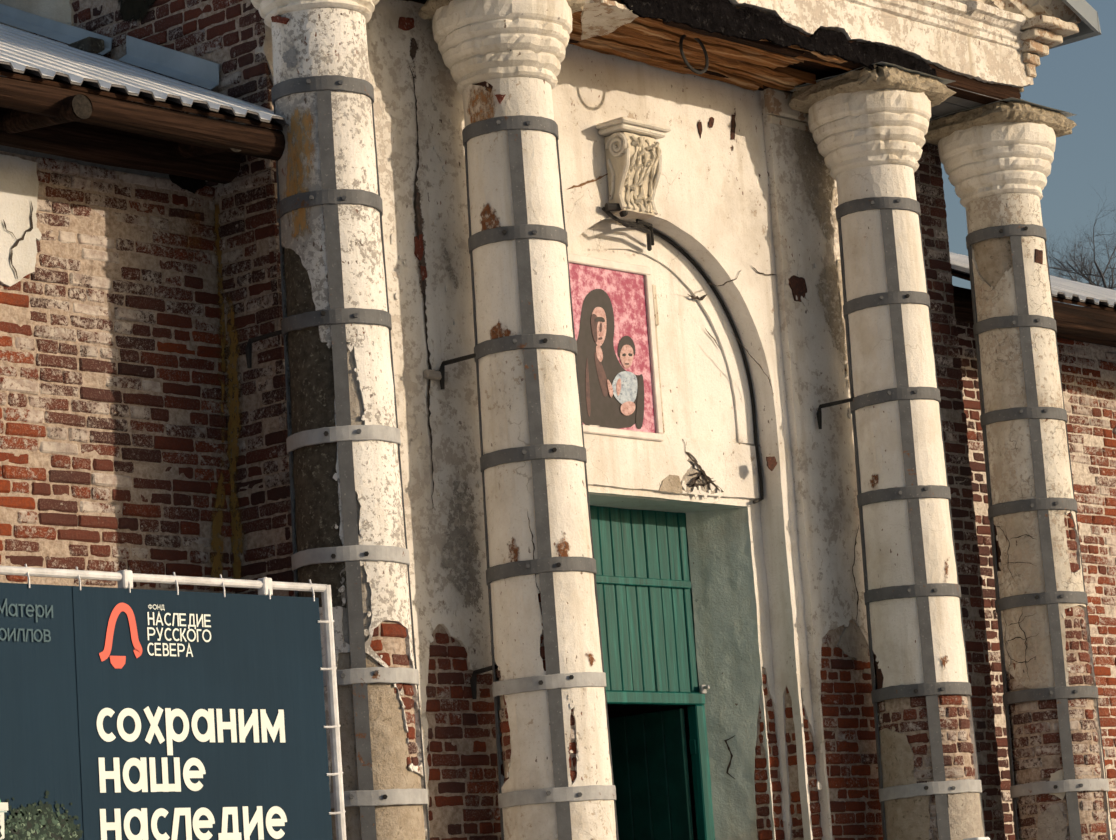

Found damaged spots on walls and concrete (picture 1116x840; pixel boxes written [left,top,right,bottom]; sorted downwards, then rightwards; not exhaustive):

rust [286,109,314,197]
rust [467,87,495,123]
crack [3,202,33,279]
crack [409,38,434,503]
rust [480,203,501,231]
spalling [0,151,236,594]
spalling [754,142,1116,840]
peeling [297,562,351,670]
crack [1003,608,1038,689]
peeling [330,684,359,793]
spalling [367,618,513,840]
crack [724,736,735,779]